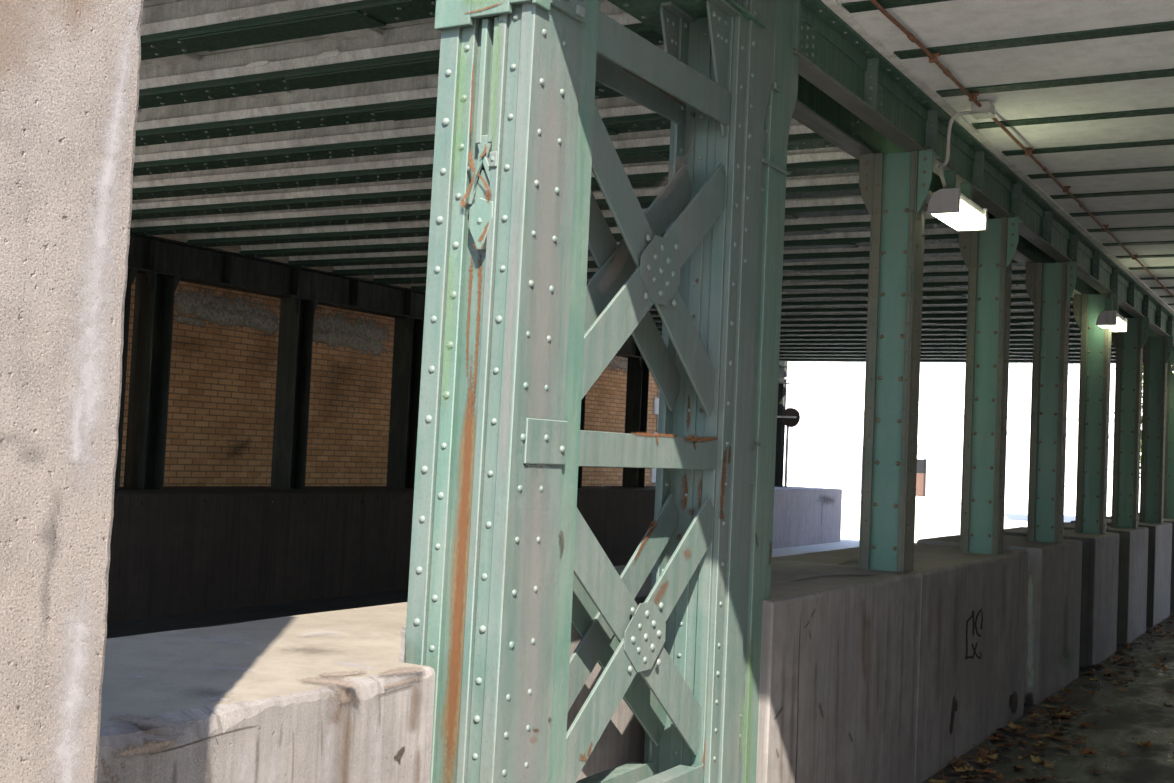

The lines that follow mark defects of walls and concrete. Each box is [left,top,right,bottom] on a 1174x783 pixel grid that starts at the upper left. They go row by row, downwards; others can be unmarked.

corrosion [460,145,492,206]
corrosion [634,396,718,448]
corrosion [447,223,488,772]
corrosion [720,447,731,519]
spalling [302,671,365,707]